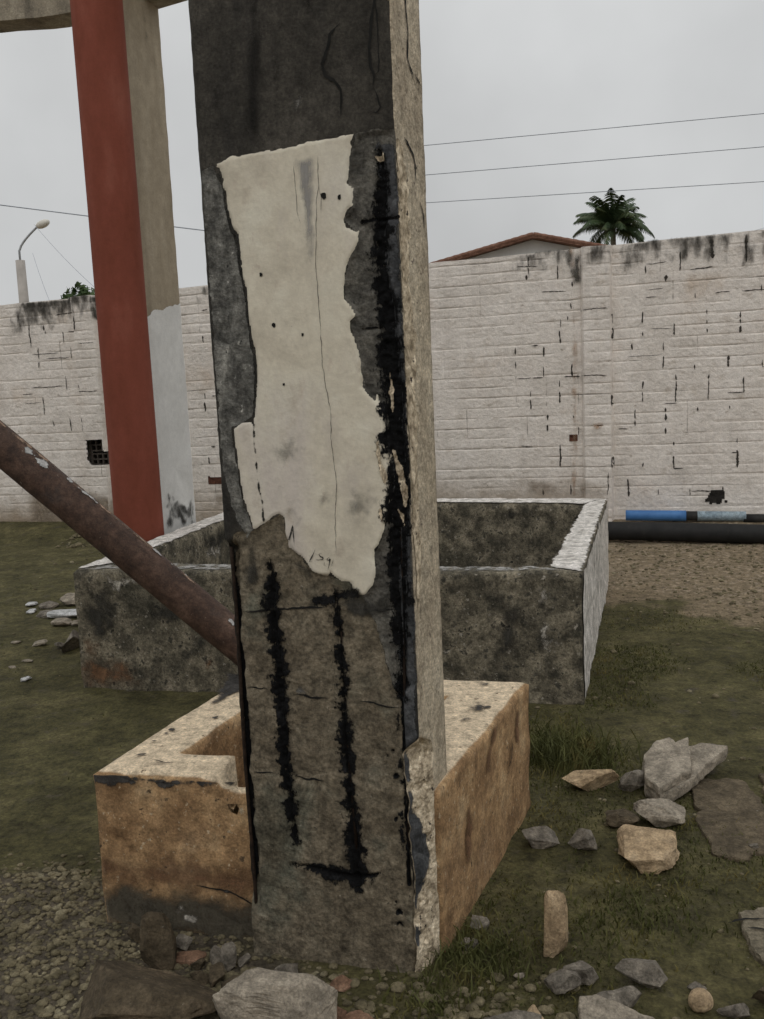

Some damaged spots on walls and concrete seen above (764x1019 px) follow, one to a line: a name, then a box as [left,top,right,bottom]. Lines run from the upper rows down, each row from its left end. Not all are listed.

crack [321,23,343,113]
leakage [591,246,603,260]
leakage [622,240,661,266]
leakage [672,235,729,259]
leakage [548,250,580,283]
leakage [16,295,97,330]
peeling [25,447,49,468]
spalling [89,439,109,465]
spalling [94,128,440,973]